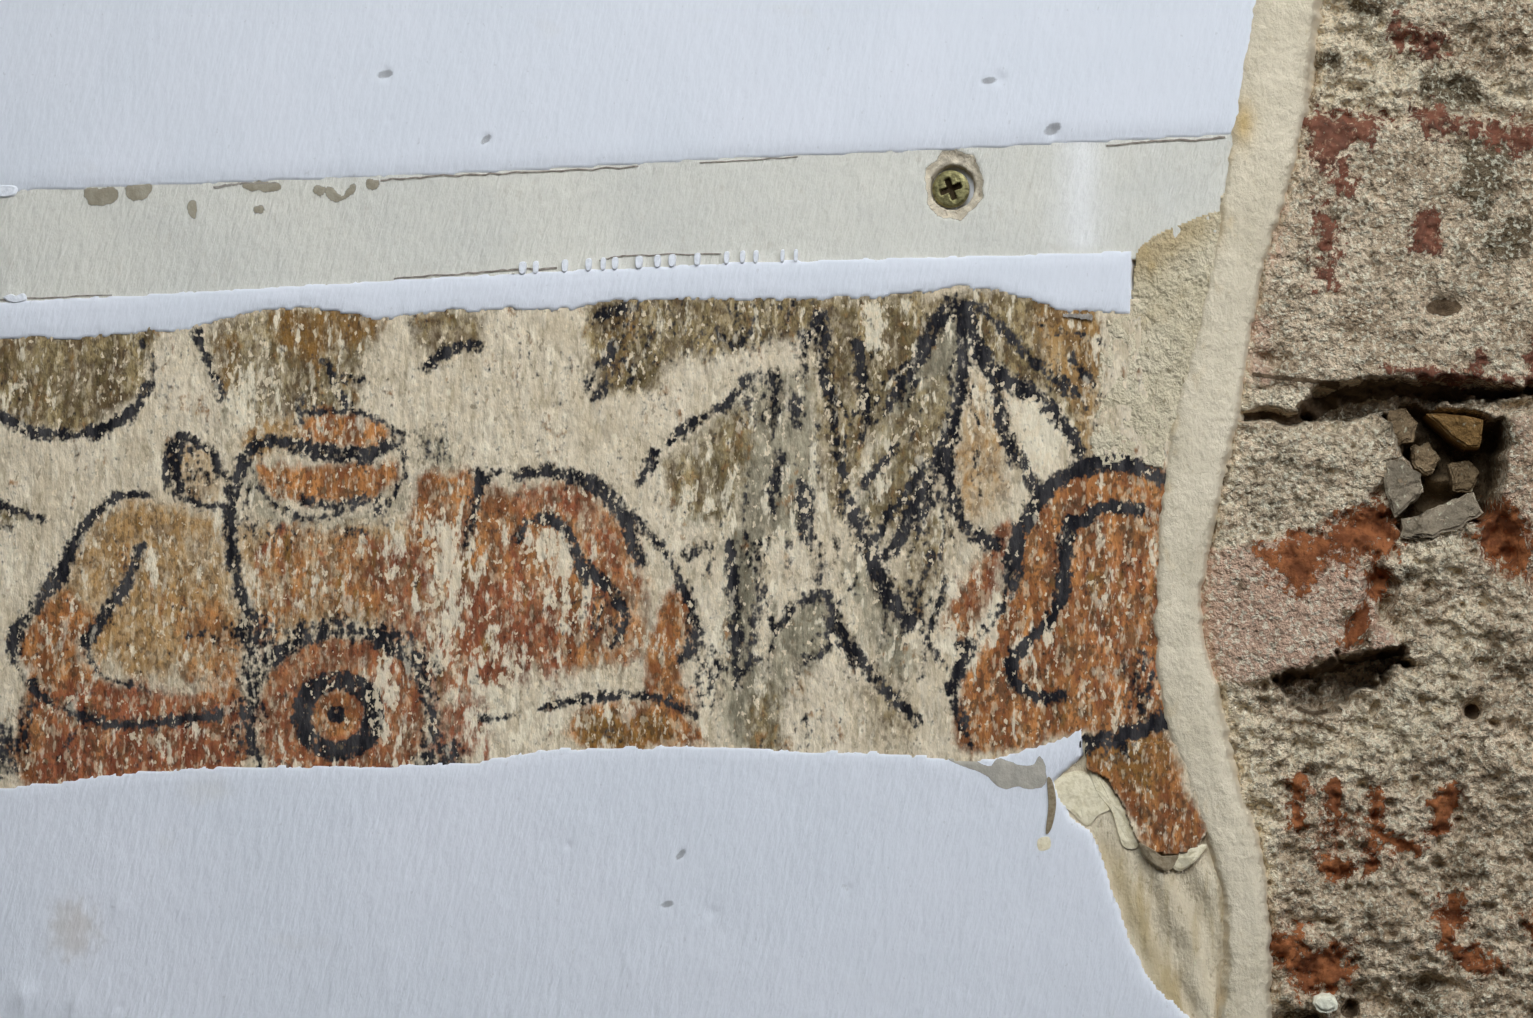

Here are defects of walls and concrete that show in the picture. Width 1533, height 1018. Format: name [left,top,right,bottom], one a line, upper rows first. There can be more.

spalling [1379,329,1533,392]
crack [1243,372,1533,425]
spalling [1252,403,1533,654]
crack [1272,644,1411,717]